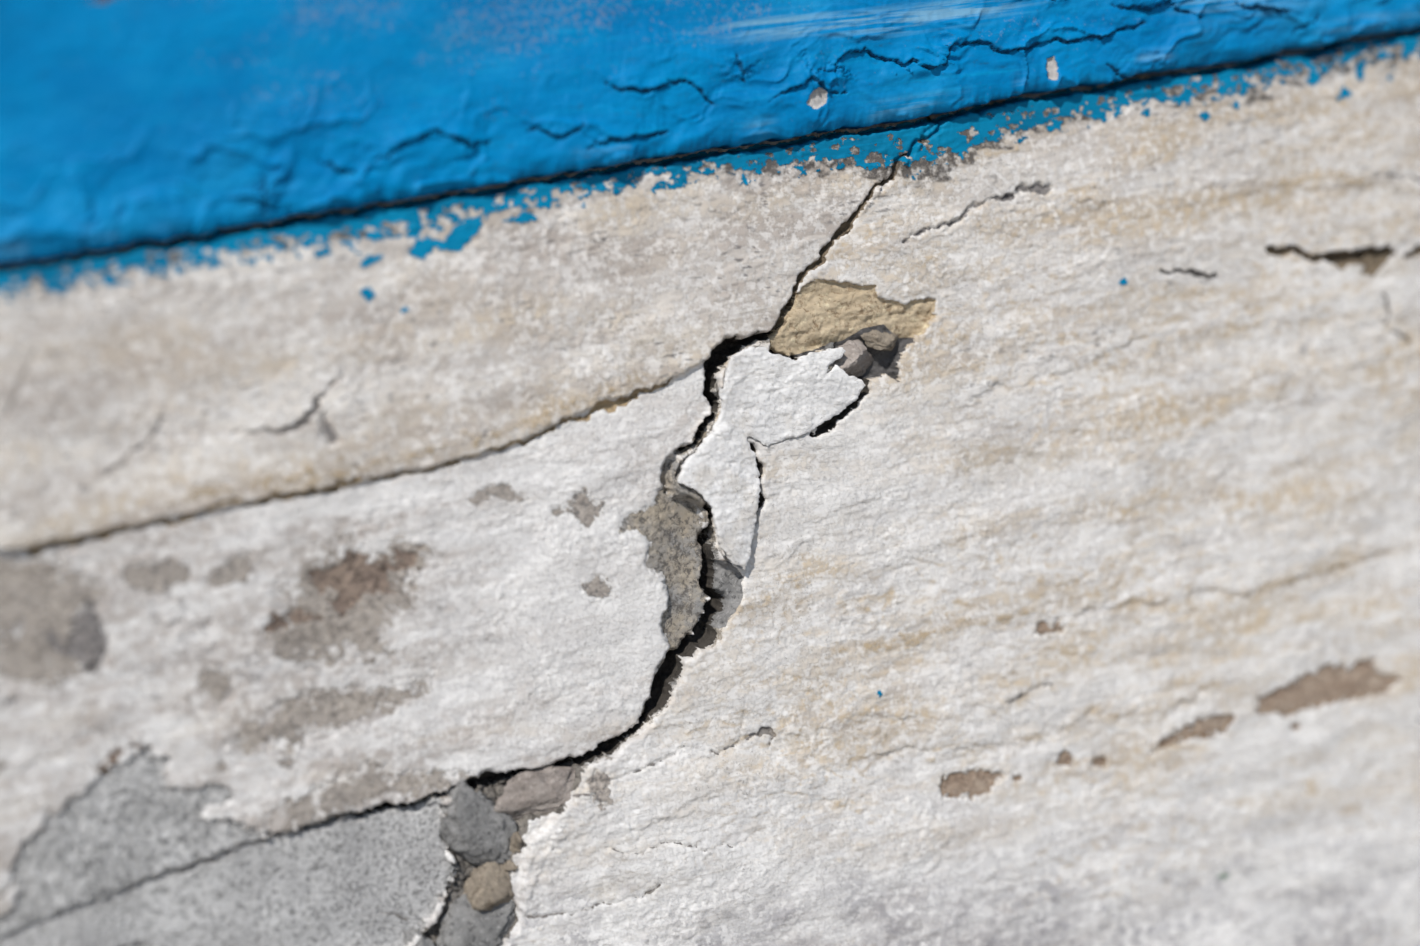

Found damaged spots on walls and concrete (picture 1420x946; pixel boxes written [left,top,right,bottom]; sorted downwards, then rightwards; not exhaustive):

crack [605,79,714,105]
peeling [807,88,828,109]
crack [736,0,1202,98]
crack [1236,1,1320,35]
spalling [766,279,936,382]
crack [1265,245,1420,343]
crack [24,115,937,893]
peeling [257,532,434,670]
peeling [1255,657,1405,730]
peeling [939,769,1022,800]
peeling [0,731,614,946]
crack [527,884,661,919]